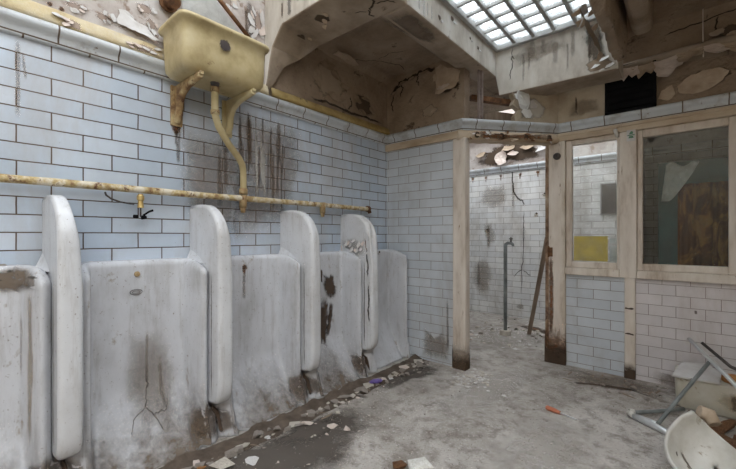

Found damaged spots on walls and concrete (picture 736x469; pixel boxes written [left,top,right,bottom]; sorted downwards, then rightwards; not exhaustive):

flaking render [52,0,87,30]
peeling [98,1,163,55]
flaking render [571,3,615,72]
peeling [620,24,736,82]
crack [356,51,435,111]
flaking render [433,64,460,94]
flaking render [658,67,731,101]
rust [470,131,553,143]
flaking render [475,144,545,166]
damp [544,261,566,366]
damp [452,351,470,371]